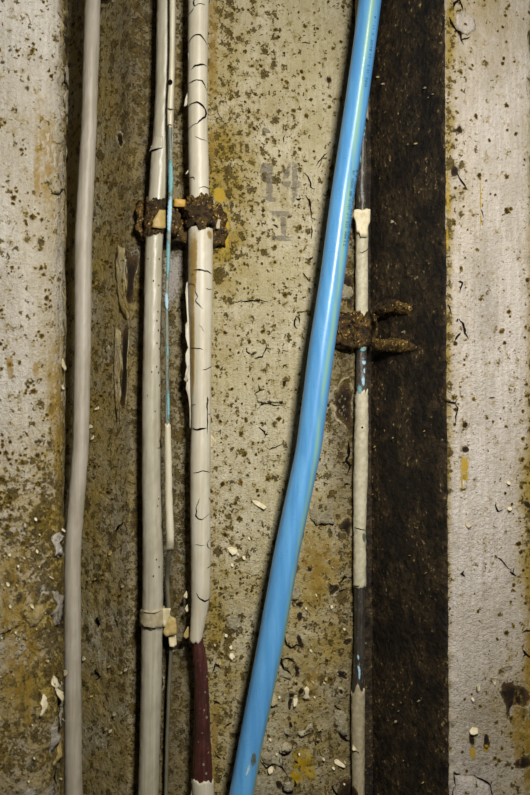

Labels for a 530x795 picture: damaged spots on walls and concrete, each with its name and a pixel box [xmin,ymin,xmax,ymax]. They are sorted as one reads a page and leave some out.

crack [449,0,471,43]
crack [255,384,286,450]
peeling [51,528,66,558]
peeling [40,694,48,717]
peeling [48,654,68,772]
peeling [271,663,349,747]
peeling [254,753,284,795]
leakage [291,749,316,783]
spalling [322,757,352,795]
crack [452,772,493,795]